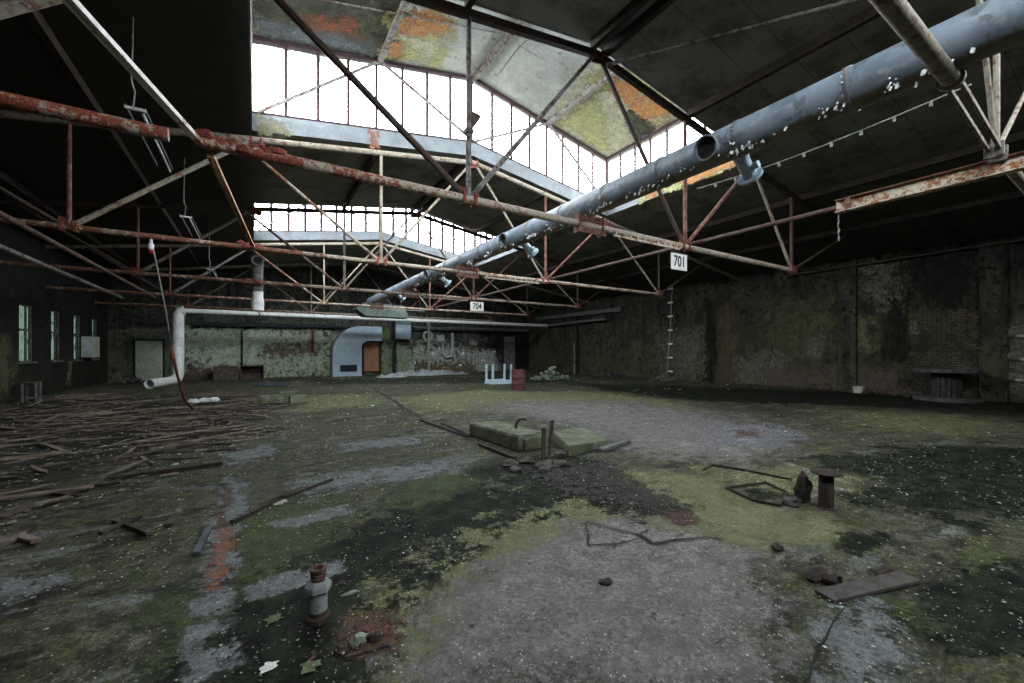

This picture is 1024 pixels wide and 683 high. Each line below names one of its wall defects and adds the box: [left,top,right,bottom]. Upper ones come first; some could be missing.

damp [253,0,455,66]
corrosion [368,129,380,149]
damp [555,67,680,151]
peeling [183,323,338,380]
peeling [395,338,502,372]
damp [592,297,1024,414]
corrosion [202,487,236,591]
damp [131,455,892,683]